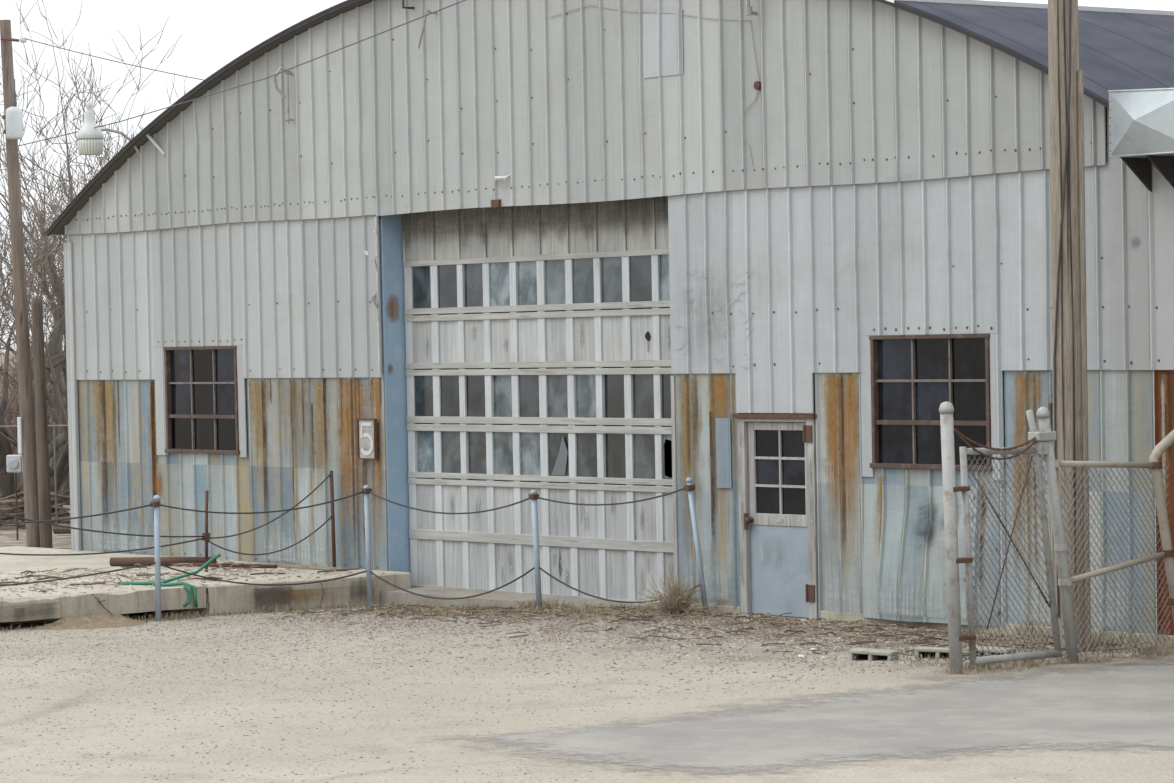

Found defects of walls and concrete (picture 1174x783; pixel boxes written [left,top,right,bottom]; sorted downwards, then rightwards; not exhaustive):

rust [95,380,119,518]
rust [150,382,160,514]
rust [251,379,271,503]
rust [289,379,328,463]
rust [341,367,391,530]
rust [681,374,727,535]
rust [827,374,858,539]
rust [1161,373,1171,493]